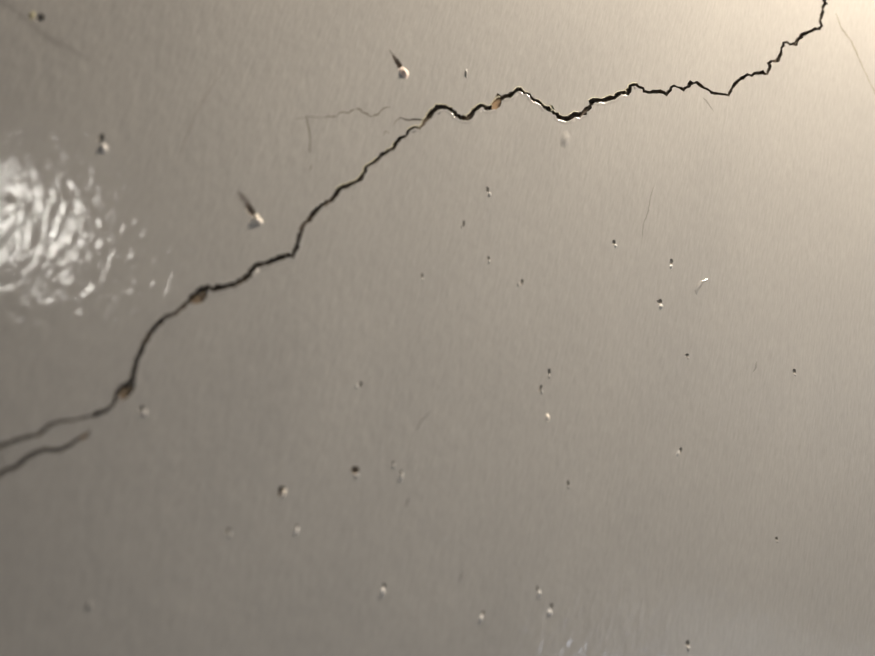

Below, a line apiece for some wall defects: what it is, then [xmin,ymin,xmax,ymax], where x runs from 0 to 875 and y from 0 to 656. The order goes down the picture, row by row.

crack [0,0,875,477]